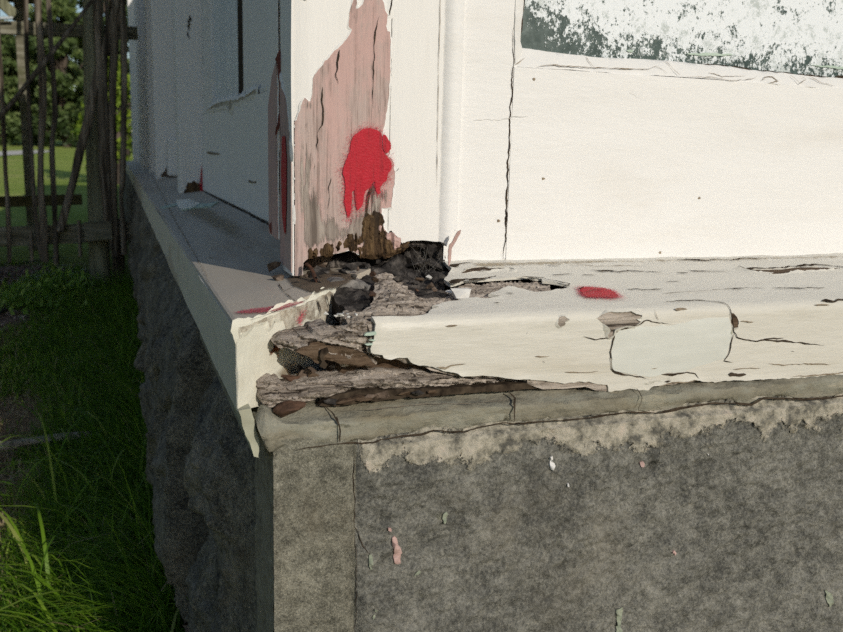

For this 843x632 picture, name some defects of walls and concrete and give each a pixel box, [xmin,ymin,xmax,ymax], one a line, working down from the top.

crack [372,0,396,95]
crack [542,56,843,86]
crack [316,50,340,150]
peeling [268,0,401,276]
crack [449,0,525,284]
crack [364,183,373,218]
peeling [448,230,461,271]
peeling [734,266,842,275]
peeling [231,287,336,344]
peeling [596,308,643,340]
peeling [729,312,740,330]
crack [299,257,843,450]